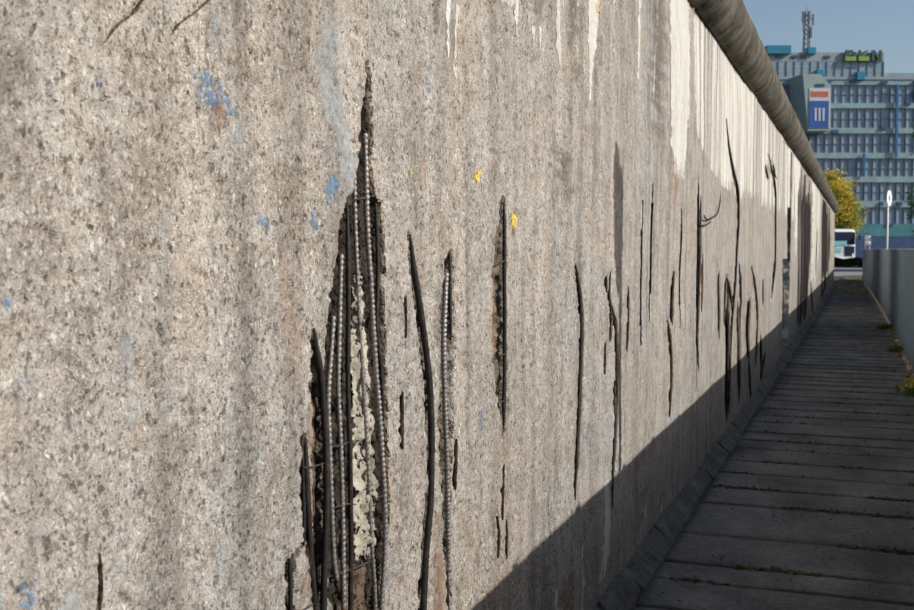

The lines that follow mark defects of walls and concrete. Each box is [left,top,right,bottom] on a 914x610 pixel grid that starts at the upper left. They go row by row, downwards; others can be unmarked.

spalling [300,60,391,610]
spalling [409,234,452,610]
crack [573,264,630,509]
crack [666,271,675,416]
crack [696,119,777,422]
crack [810,227,818,310]